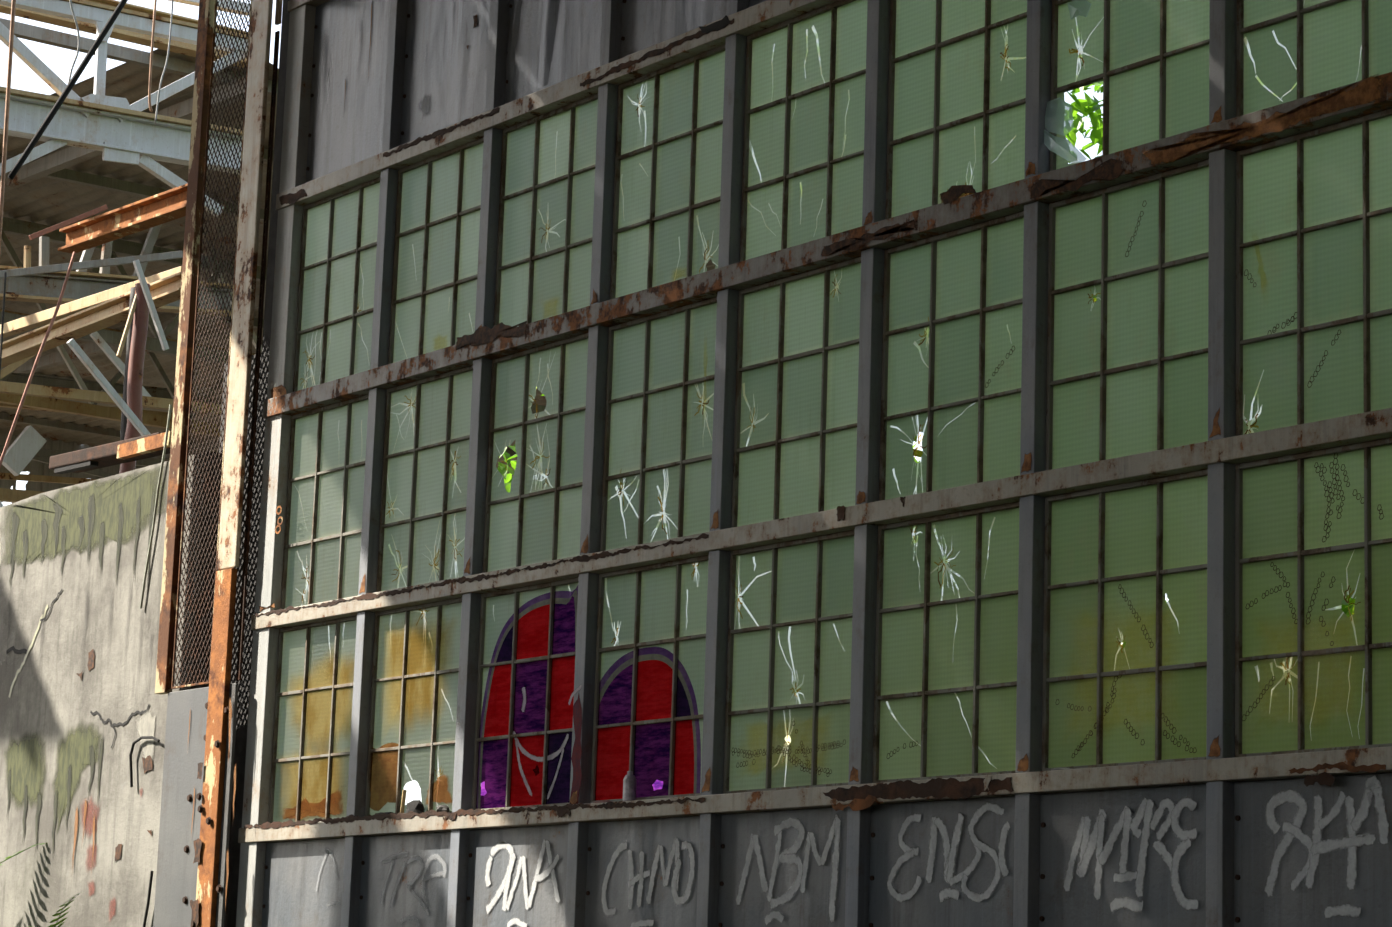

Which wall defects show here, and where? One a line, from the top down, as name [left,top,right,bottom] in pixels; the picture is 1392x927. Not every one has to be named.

rust [1143,74,1383,165]
rust [940,185,976,205]
rust [1026,159,1125,199]
rust [821,212,915,257]
rust [456,321,527,350]
leakage [0,493,154,590]
crack [6,589,62,698]
leakage [7,765,72,858]
leakage [88,737,103,802]
rust [823,754,1029,811]